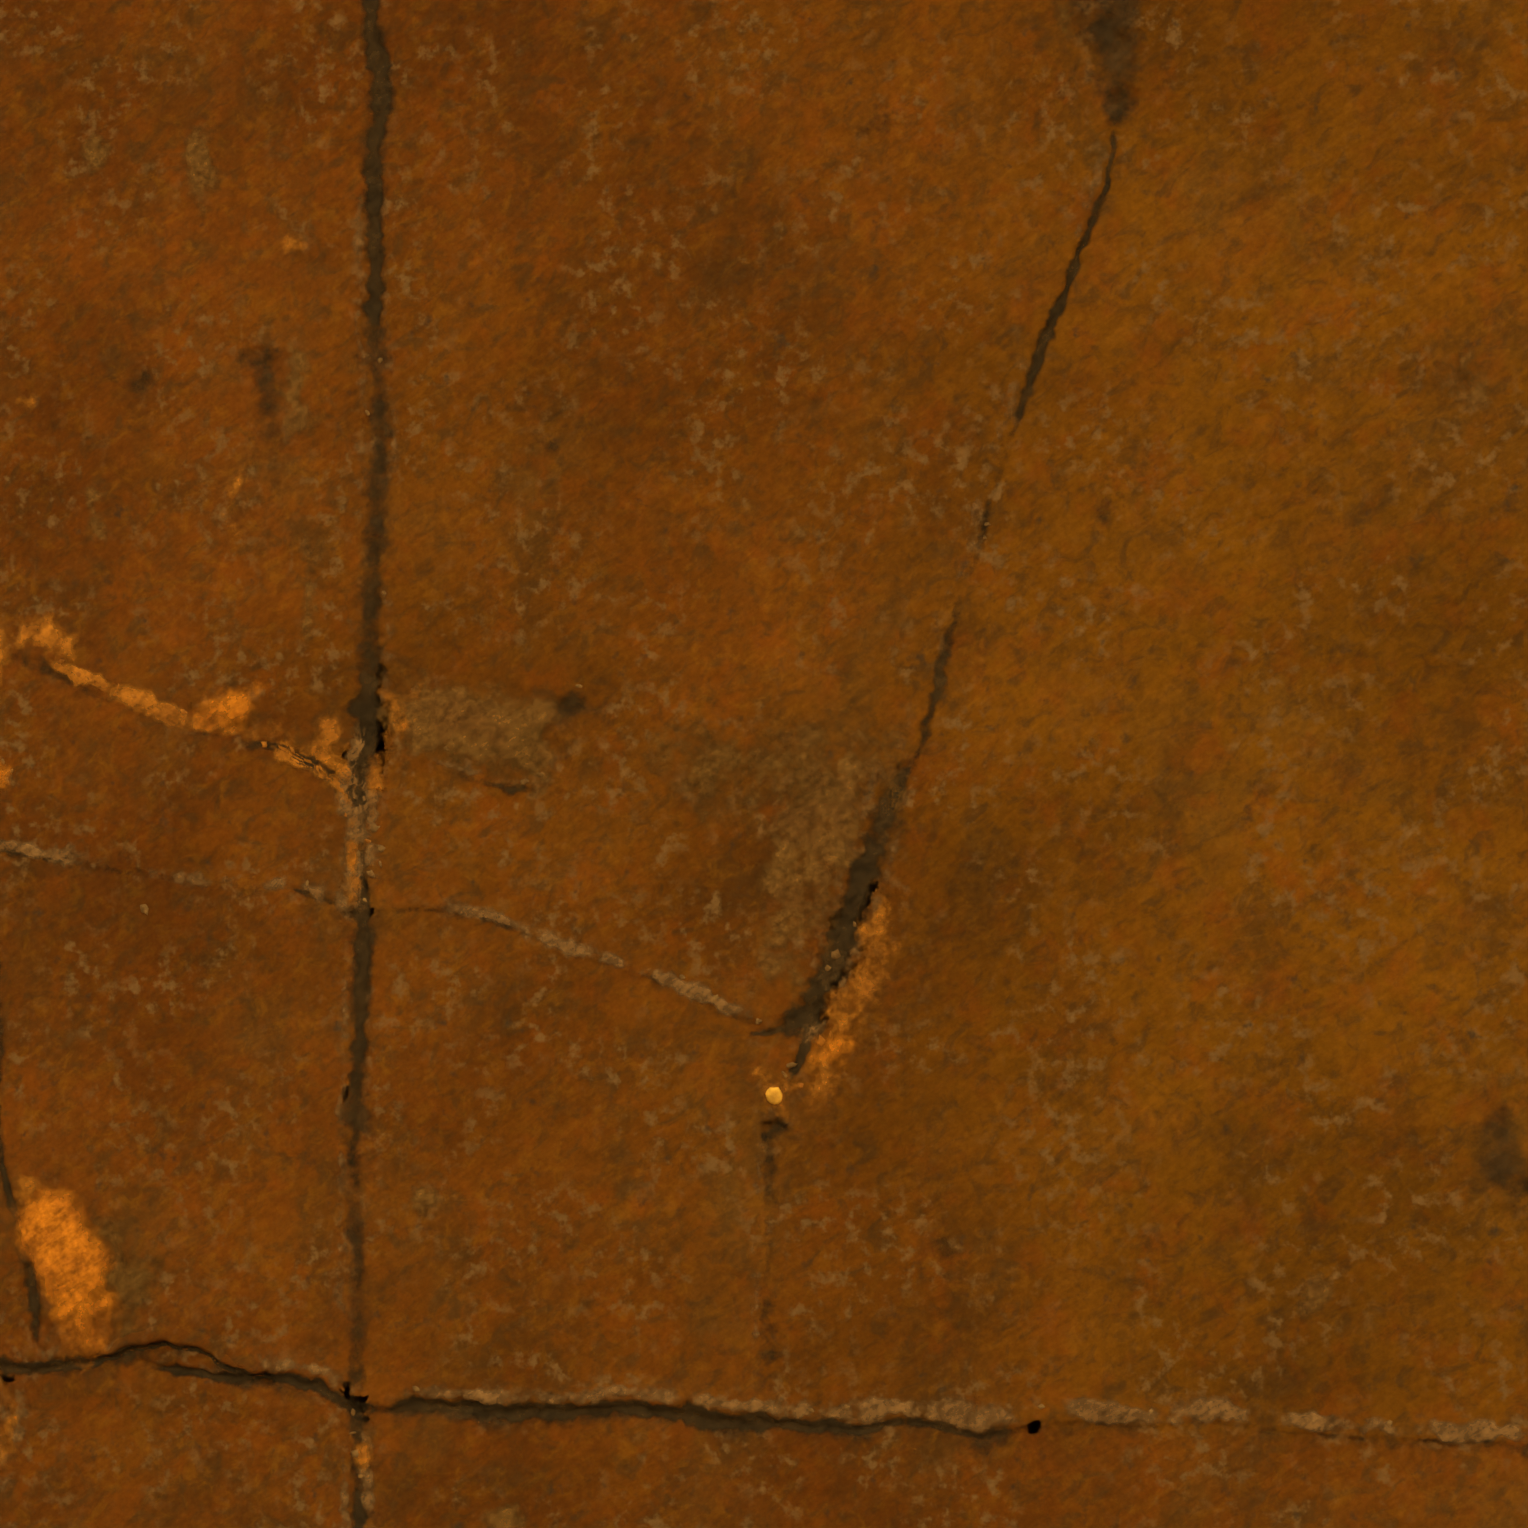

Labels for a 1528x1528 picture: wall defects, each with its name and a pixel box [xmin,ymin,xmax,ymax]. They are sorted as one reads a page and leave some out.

crack [998,135,1116,437]
crack [264,0,396,1181]
crack [972,501,991,539]
crack [0,758,13,787]
crack [0,840,95,867]
crack [140,871,226,915]
crack [441,621,957,1111]
rust [17,1177,154,1350]
crack [0,1140,1249,1528]
crack [1282,1412,1527,1455]